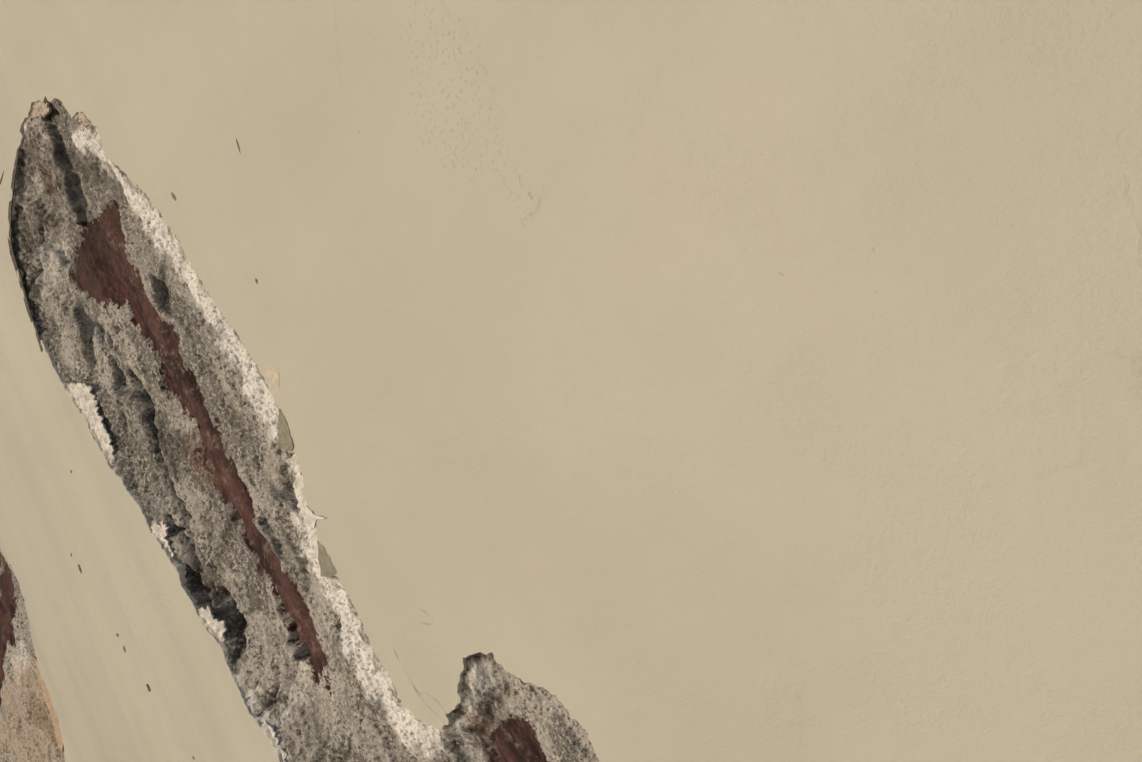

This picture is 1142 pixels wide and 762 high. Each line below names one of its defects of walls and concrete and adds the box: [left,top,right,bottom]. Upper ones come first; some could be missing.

spalling [0,96,600,762]